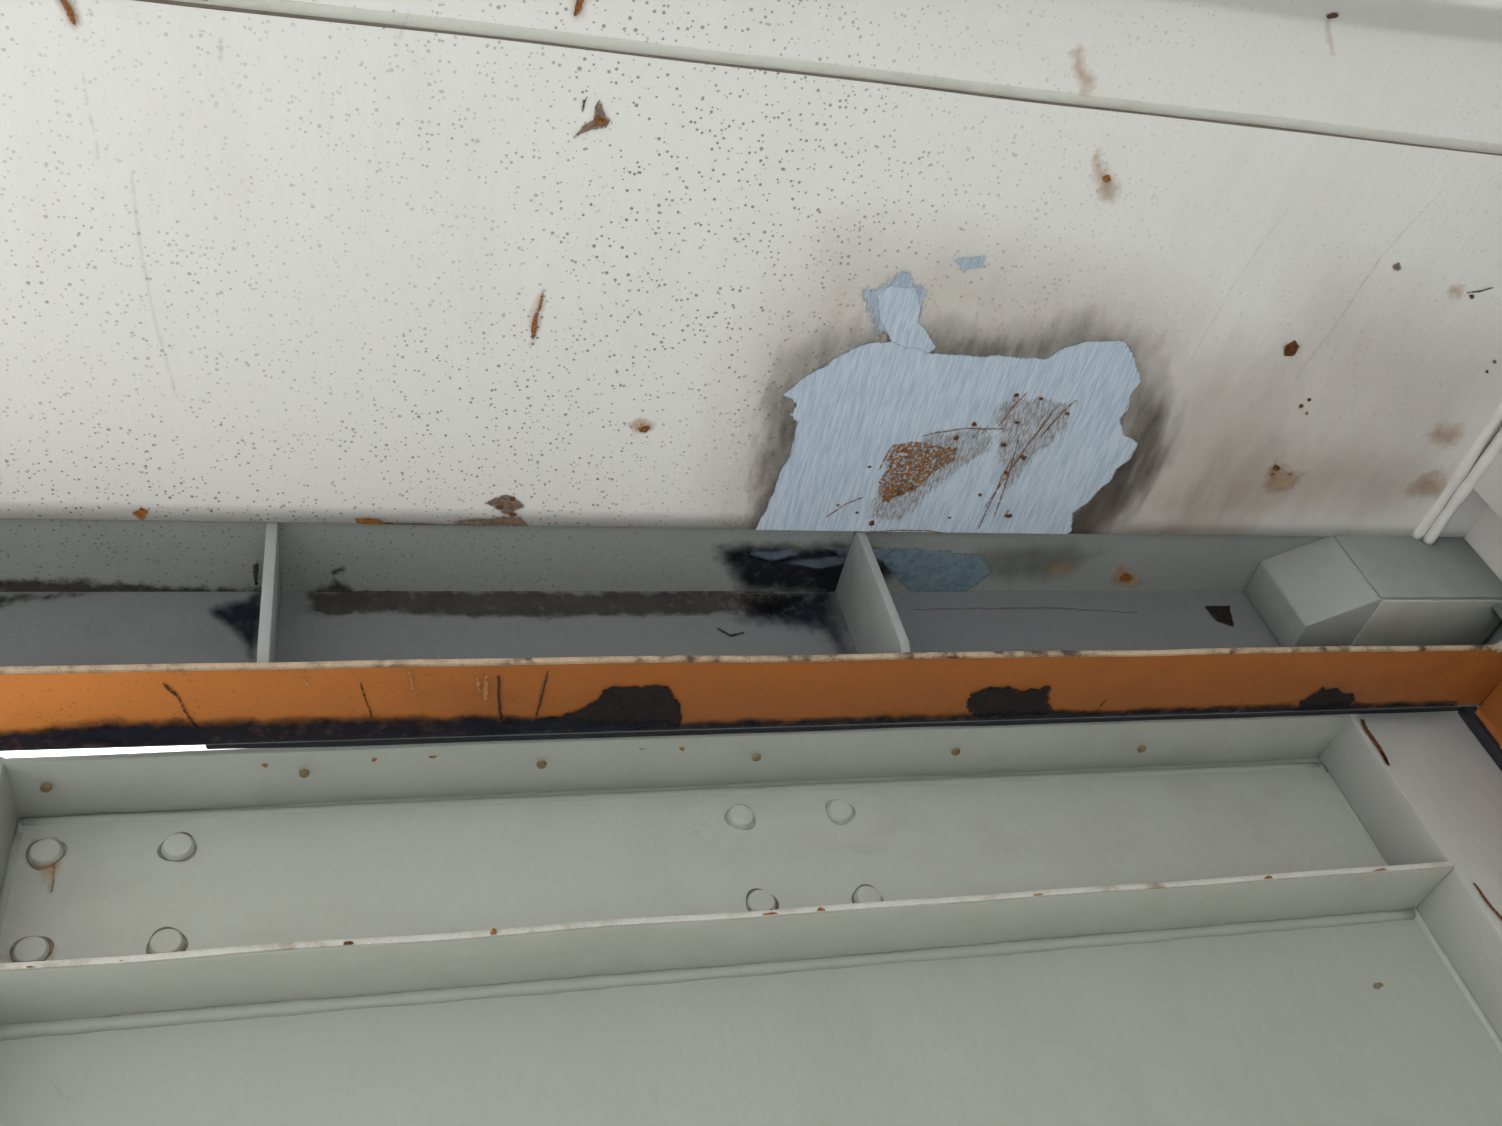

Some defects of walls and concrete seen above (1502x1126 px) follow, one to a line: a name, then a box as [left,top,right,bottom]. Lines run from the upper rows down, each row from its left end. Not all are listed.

rust [531,293,544,339]
rust [867,422,977,503]
peeling [532,685,682,726]
peeling [966,686,1055,717]